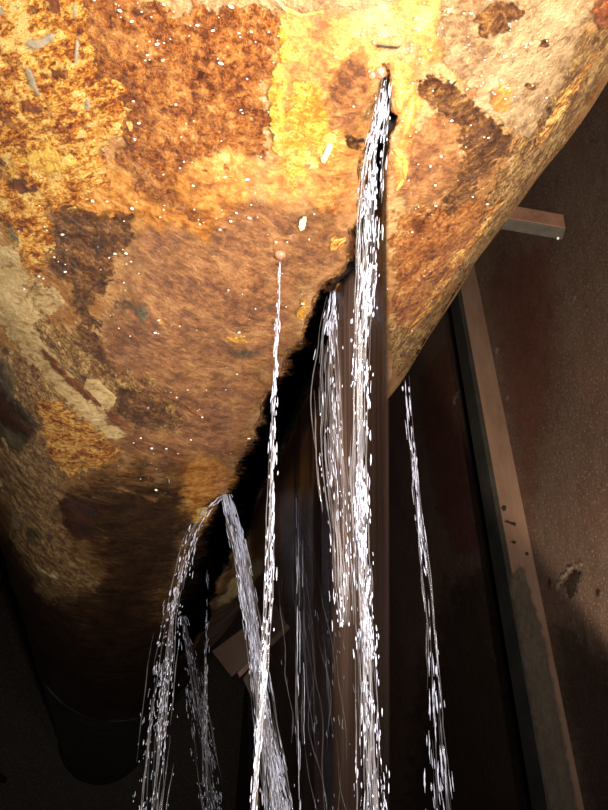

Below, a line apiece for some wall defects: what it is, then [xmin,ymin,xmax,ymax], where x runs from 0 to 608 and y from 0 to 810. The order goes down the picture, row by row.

crack [163,45,402,659]
corrosion [0,0,608,611]
peeling [548,562,583,599]